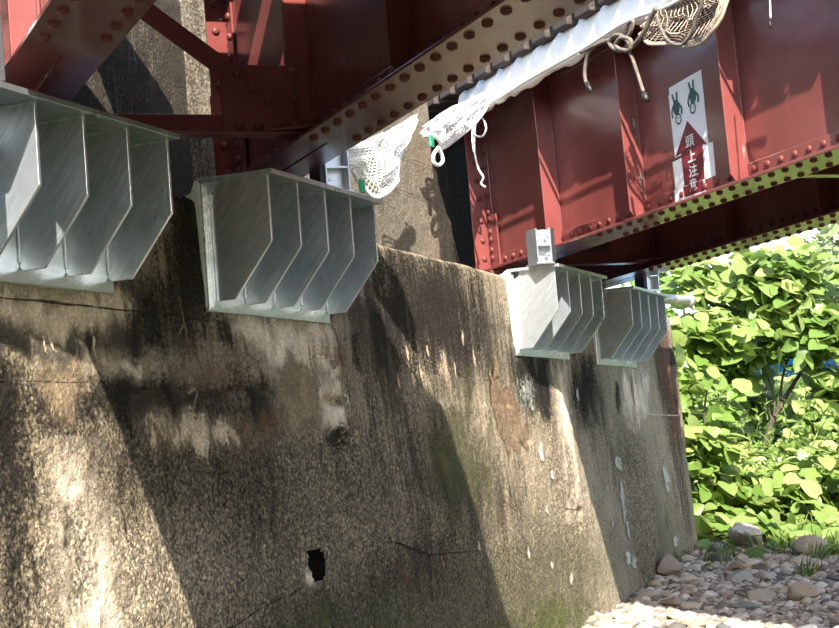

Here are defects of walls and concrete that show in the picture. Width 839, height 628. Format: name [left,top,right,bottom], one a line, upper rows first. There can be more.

crack [0,296,203,342]
leakage [368,246,488,389]
crack [0,377,88,385]
leakage [0,193,233,628]
crack [227,586,304,628]